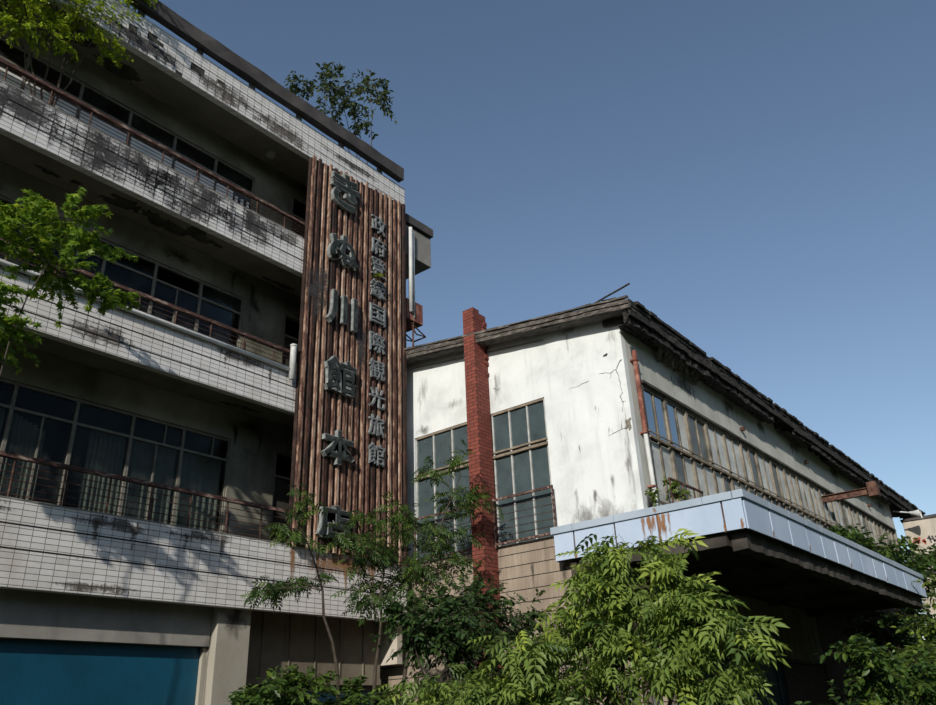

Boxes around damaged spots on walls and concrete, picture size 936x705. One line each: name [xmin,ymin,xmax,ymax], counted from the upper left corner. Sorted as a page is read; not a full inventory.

damp [197,74,313,153]
damp [0,81,298,246]
crack [570,359,625,436]
corrosion [641,509,670,541]
corrosion [290,548,377,588]